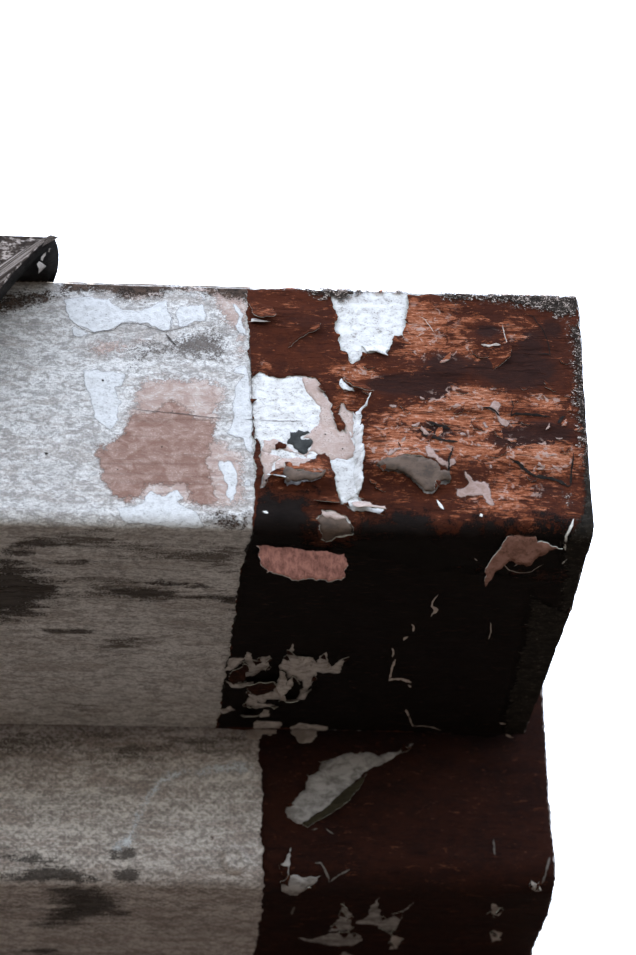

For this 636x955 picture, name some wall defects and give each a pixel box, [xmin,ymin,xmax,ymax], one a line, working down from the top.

crack [76,316,198,345]
peeling [83,284,271,360]
peeling [332,290,408,370]
peeling [94,371,386,541]
peeling [380,389,469,448]
peeling [471,421,517,458]
peeling [544,381,584,431]
peeling [220,644,349,743]
peeling [285,742,413,827]
peeling [279,848,320,896]
peeling [300,897,413,955]
peeling [486,903,504,918]